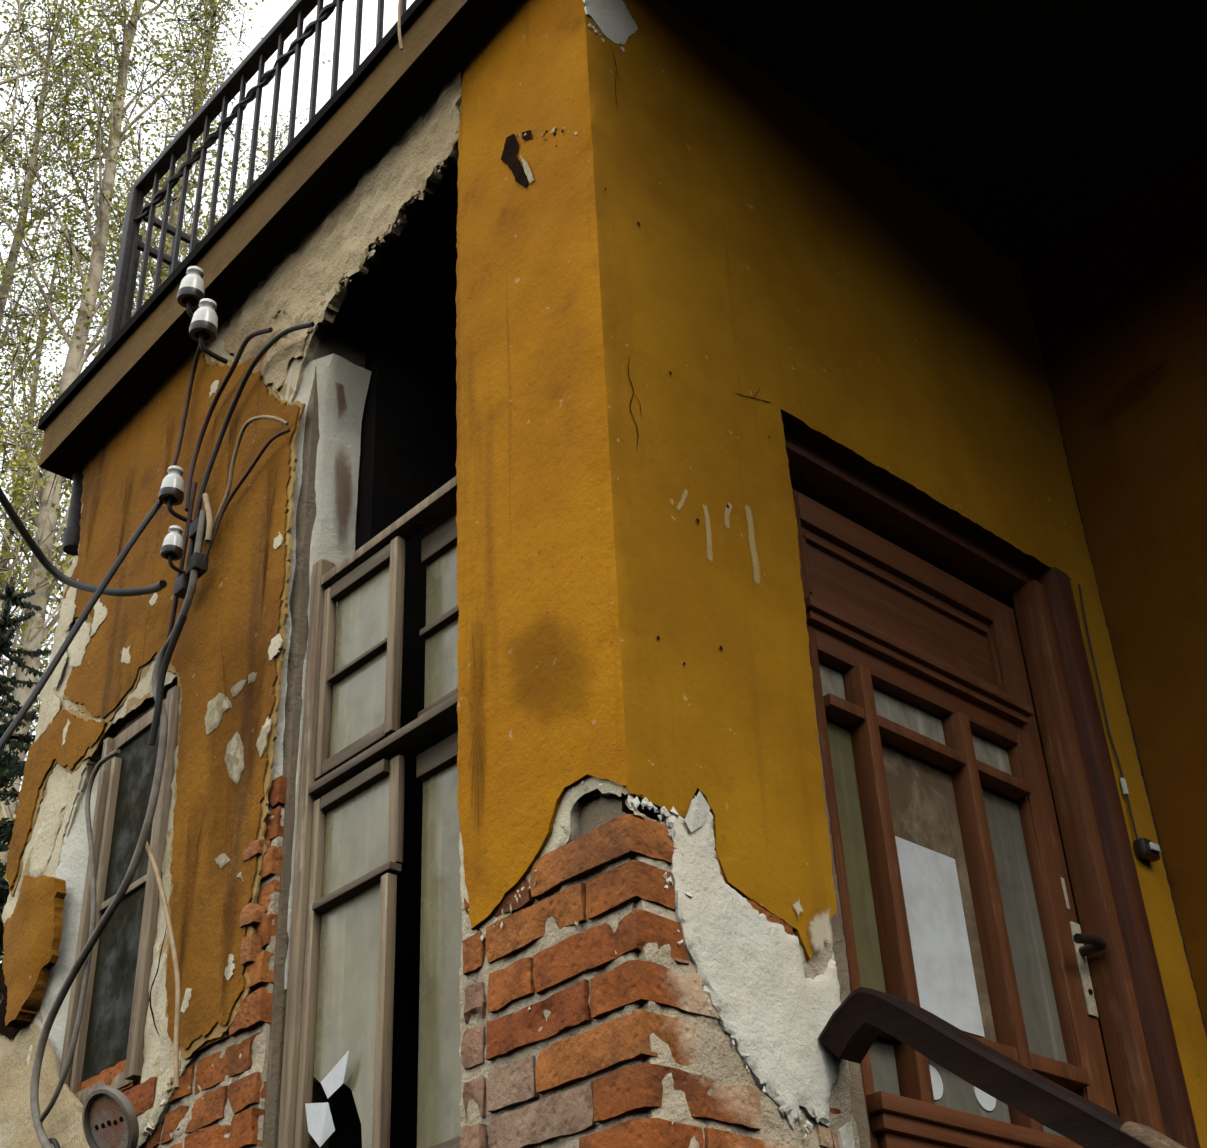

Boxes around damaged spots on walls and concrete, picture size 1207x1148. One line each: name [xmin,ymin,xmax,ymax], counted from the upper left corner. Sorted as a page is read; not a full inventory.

hole [501,126,577,188]
crack [628,356,641,446]
spalling [77,72,463,1148]
peeling [0,545,183,1067]
spalling [459,781,860,1148]